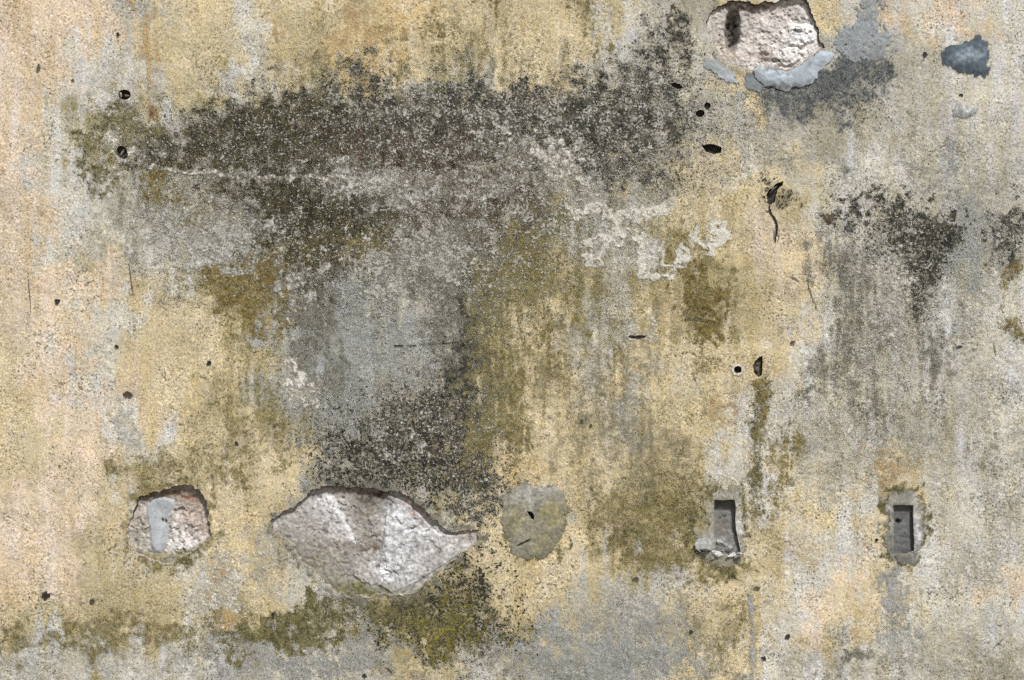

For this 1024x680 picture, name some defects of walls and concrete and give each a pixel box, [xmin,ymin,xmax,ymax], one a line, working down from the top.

spalling [706,0,825,71]
crack [765,205,780,243]
water stain [83,0,900,680]
water stain [784,166,1024,473]
spalling [127,484,212,565]
spalling [270,485,479,598]